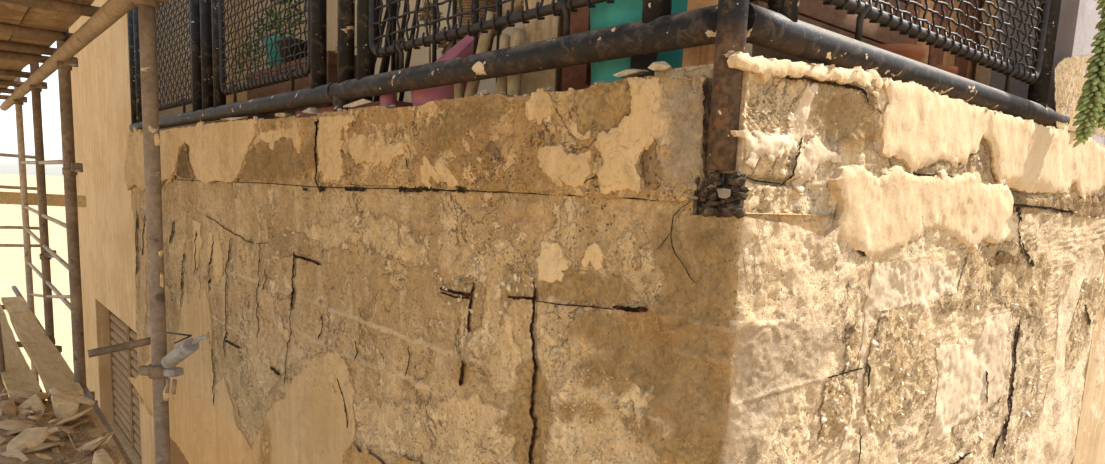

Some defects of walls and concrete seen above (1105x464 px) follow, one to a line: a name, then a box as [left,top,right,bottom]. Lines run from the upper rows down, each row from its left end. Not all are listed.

peeling [124,126,145,191]
peeling [159,116,302,187]
peeling [524,88,557,126]
peeling [570,77,674,198]
crack [135,211,321,406]
peeling [168,209,605,464]
crack [440,282,474,333]
crack [457,360,465,386]
crack [507,281,648,464]
crack [827,363,871,387]
peeling [688,51,1105,464]
crack [953,321,1020,464]